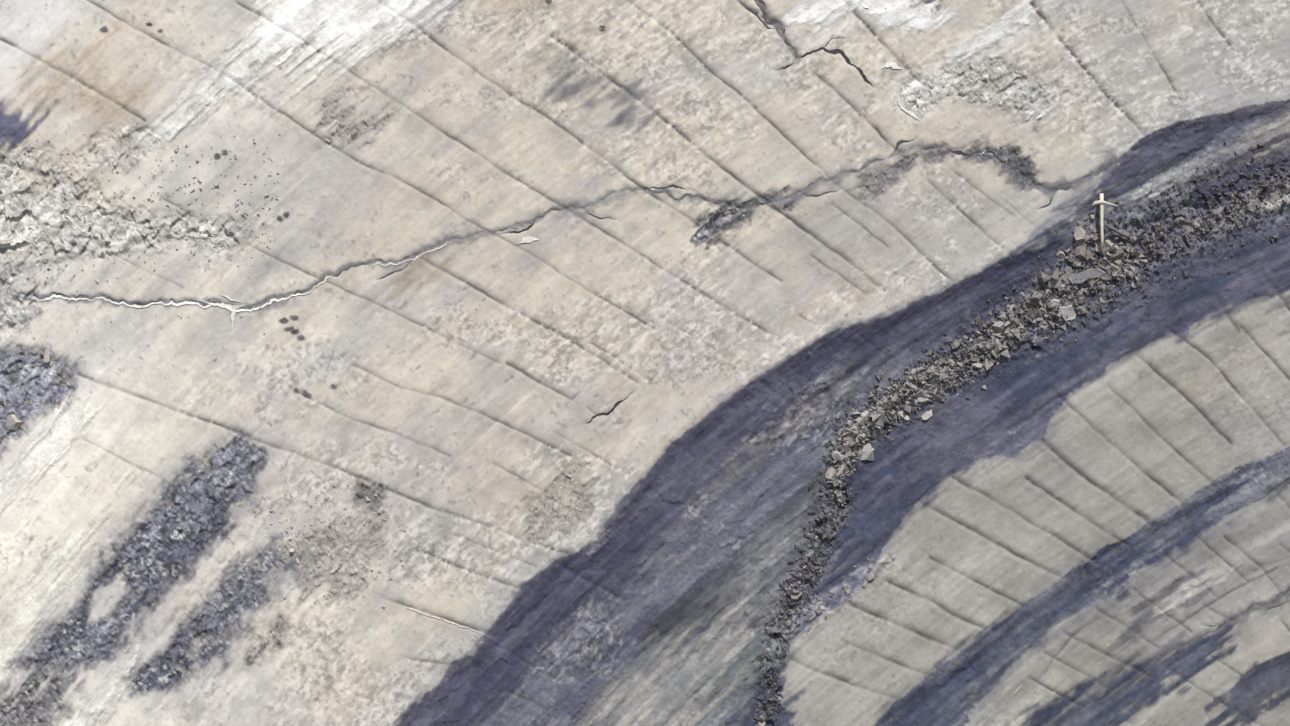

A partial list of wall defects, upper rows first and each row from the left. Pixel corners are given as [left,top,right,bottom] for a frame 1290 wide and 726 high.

crack [739,0,873,86]
peeling [0,0,458,454]
crack [14,138,1117,312]
spalling [858,144,1044,199]
spalling [950,214,1146,354]
crack [587,393,631,423]
spalling [825,367,940,484]
spalling [0,434,266,726]
spalling [126,483,386,696]
spalling [765,559,850,634]